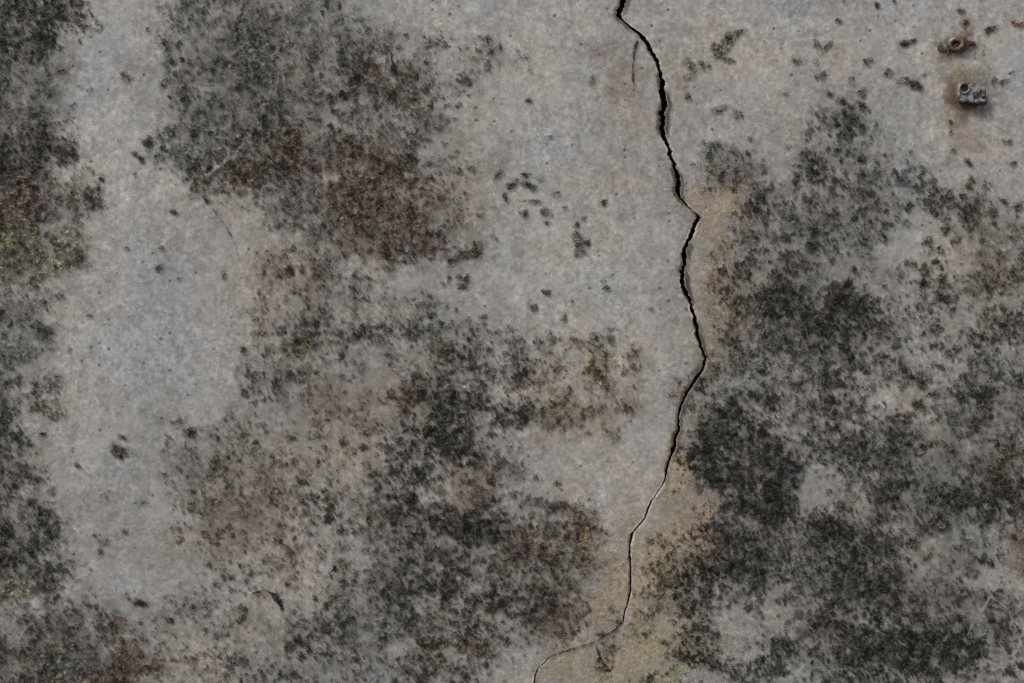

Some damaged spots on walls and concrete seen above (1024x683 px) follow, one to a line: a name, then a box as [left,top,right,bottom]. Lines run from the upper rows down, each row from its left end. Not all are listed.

mould [0,0,108,224]
mould [814,39,833,80]
mould [884,68,926,91]
corrosion [940,23,989,144]
mould [495,170,568,225]
crack [533,0,710,683]
mould [0,290,318,683]